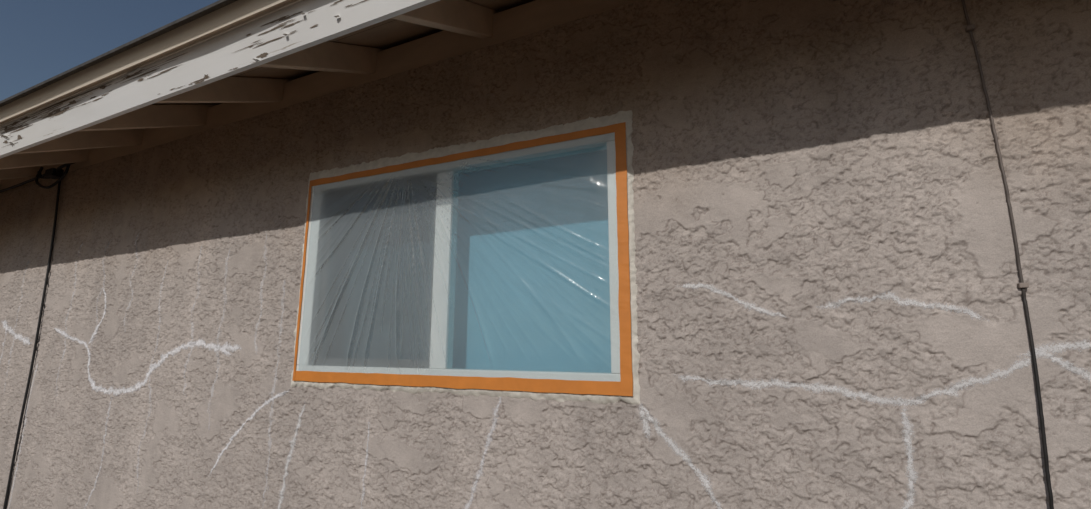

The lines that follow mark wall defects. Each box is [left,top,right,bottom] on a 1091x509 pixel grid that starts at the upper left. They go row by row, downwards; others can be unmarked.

peeling [235,10,318,64]
peeling [0,52,188,147]
crack [683,284,782,316]
crack [816,292,980,319]
crack [0,321,38,506]
crack [54,289,241,509]
crack [211,391,305,509]
crack [465,397,501,509]
crack [639,406,722,509]
crack [680,341,1091,509]